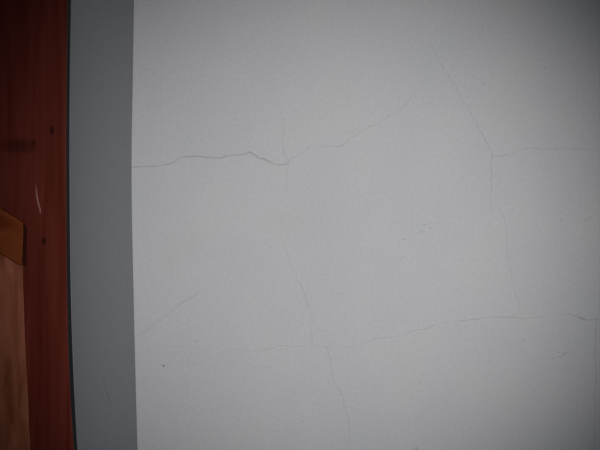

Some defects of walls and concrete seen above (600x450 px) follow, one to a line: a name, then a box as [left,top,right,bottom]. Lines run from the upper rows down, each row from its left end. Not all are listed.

crack [132,87,430,197]